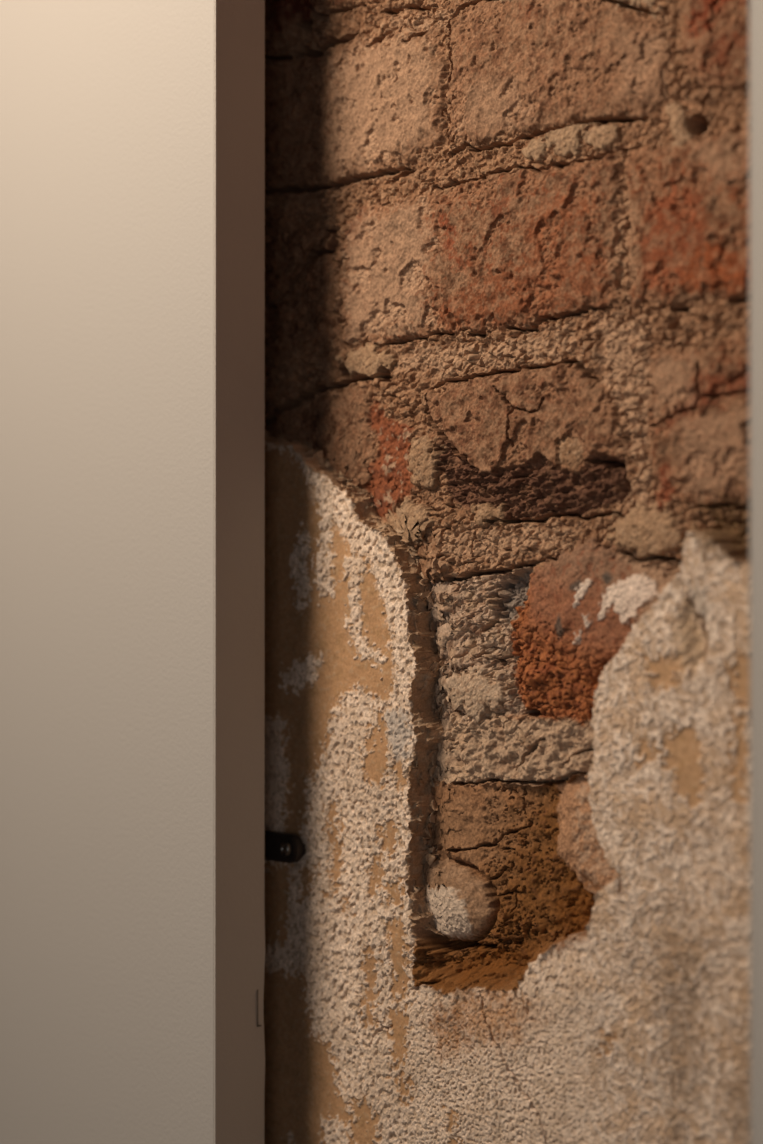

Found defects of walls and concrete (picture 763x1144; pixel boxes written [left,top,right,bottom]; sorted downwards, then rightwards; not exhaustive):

flaking render [265,0,750,1107]
crack [479,992,547,1137]